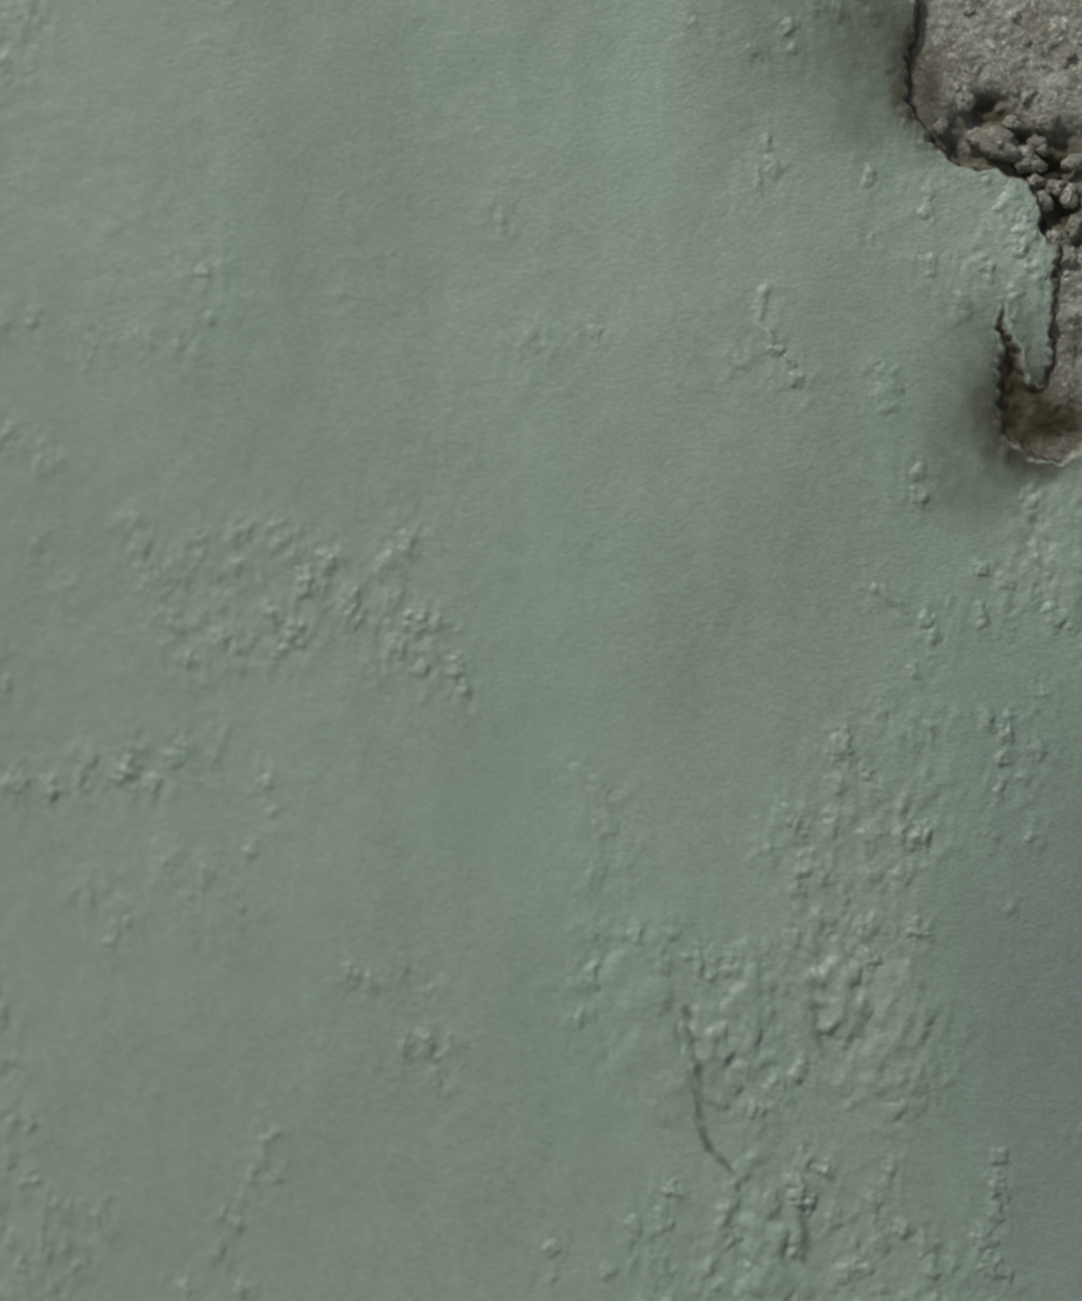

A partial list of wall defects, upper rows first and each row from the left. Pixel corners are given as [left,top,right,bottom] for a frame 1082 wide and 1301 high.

flaking render [887,0,1082,480]